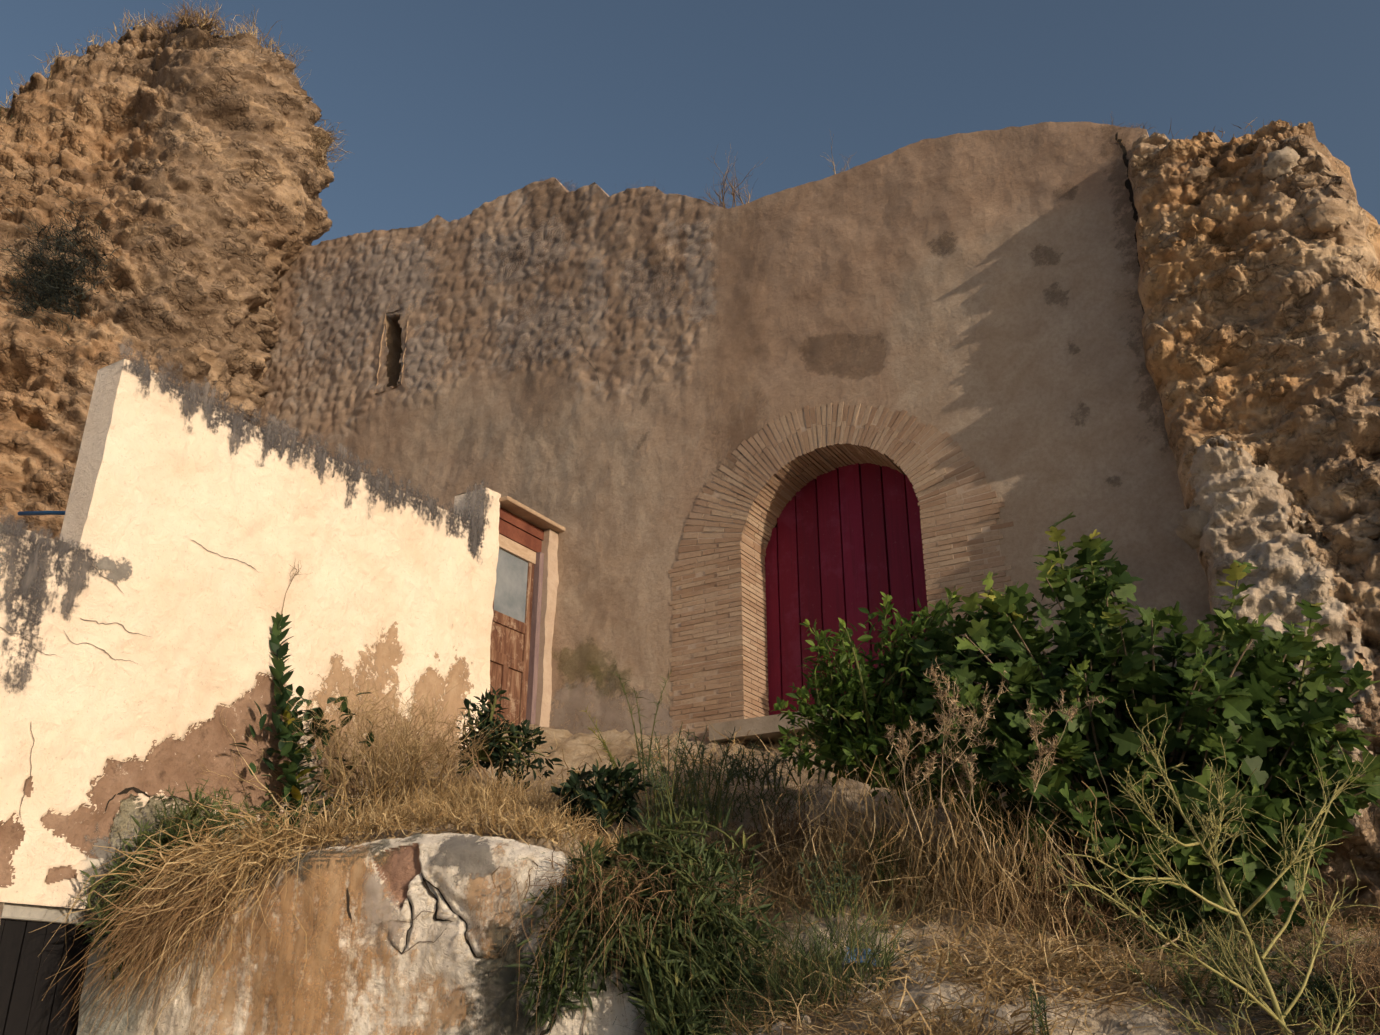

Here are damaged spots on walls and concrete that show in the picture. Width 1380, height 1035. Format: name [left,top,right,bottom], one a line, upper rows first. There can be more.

crack [1115,132,1140,267]
leakage [118,341,493,560]
leakage [0,506,132,693]
spalling [0,812,26,888]
spalling [23,776,34,797]
spalling [41,622,474,920]
crack [347,873,495,958]
crack [540,1005,587,1035]